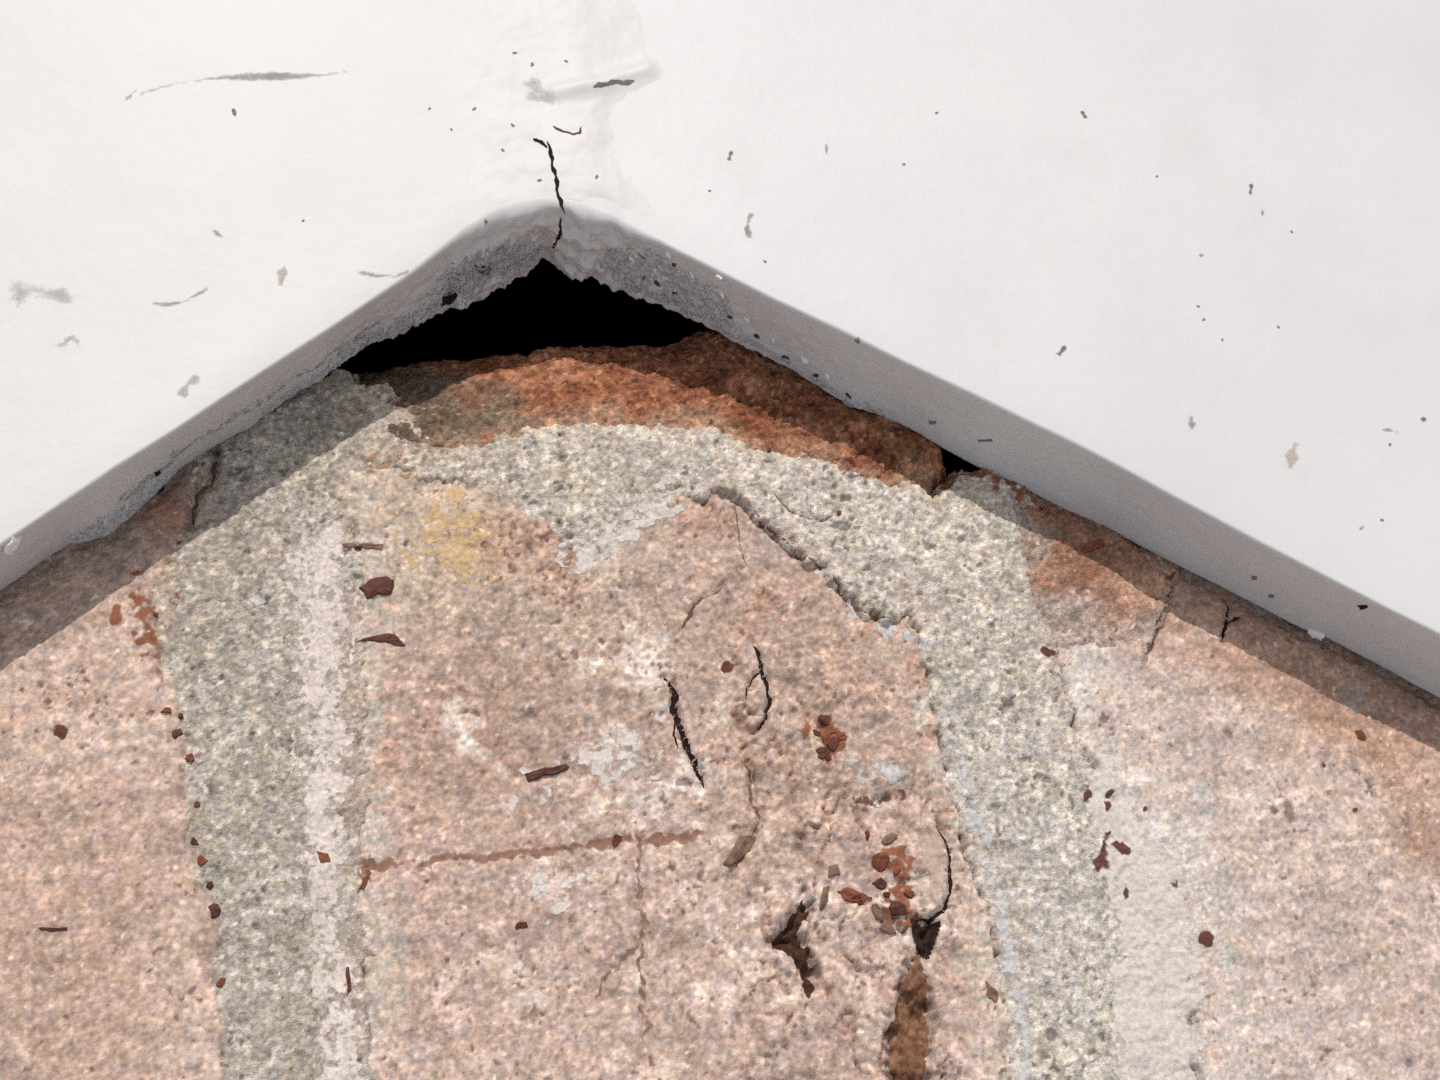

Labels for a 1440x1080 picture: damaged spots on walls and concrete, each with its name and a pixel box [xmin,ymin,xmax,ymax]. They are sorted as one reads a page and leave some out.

crack [533,126,582,249]
spalling [359,576,394,599]
crack [663,678,704,788]
crack [731,646,772,873]